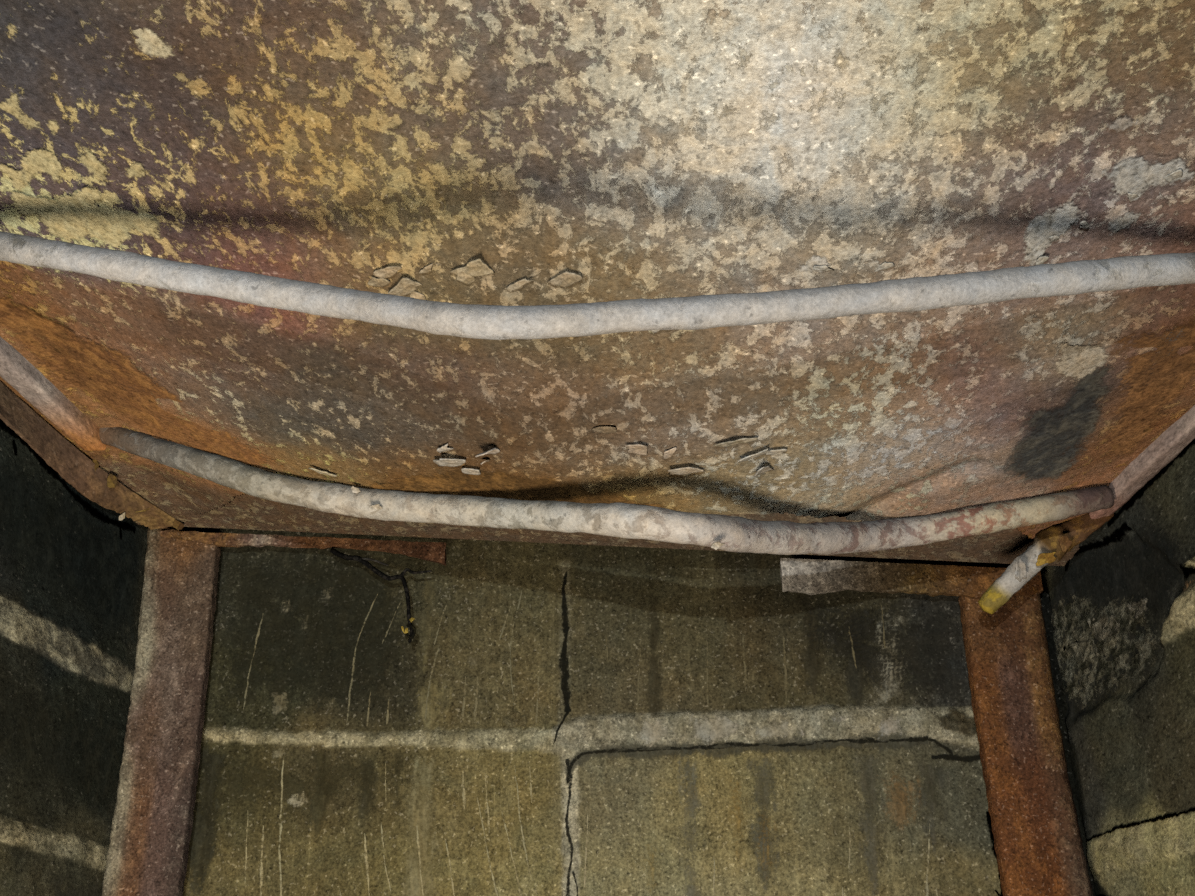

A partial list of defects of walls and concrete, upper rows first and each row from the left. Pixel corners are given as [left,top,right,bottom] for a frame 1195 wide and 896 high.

rust [0,296,281,468]
rust [1104,318,1195,457]
crack [0,419,135,539]
rust [372,467,662,508]
crack [553,572,980,896]
crack [986,811,1003,896]